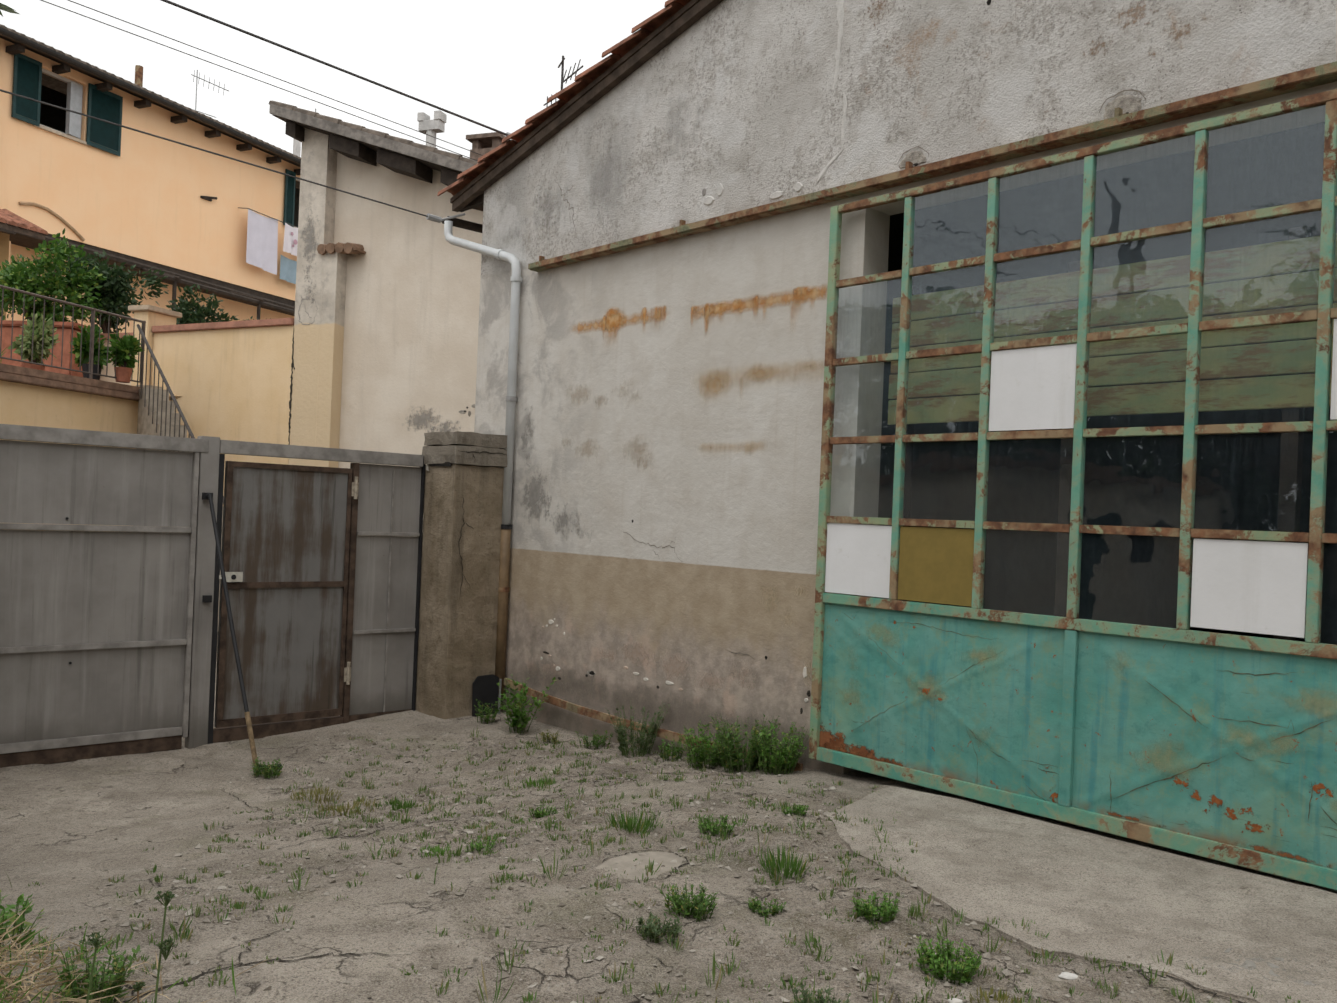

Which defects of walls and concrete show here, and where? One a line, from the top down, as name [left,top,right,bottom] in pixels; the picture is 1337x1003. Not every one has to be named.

corrosion [577,307,666,332]
corrosion [691,287,827,322]
crack [623,532,684,562]
corrosion [819,725,903,766]
corrosion [1309,783,1334,797]
corrosion [1173,776,1313,862]